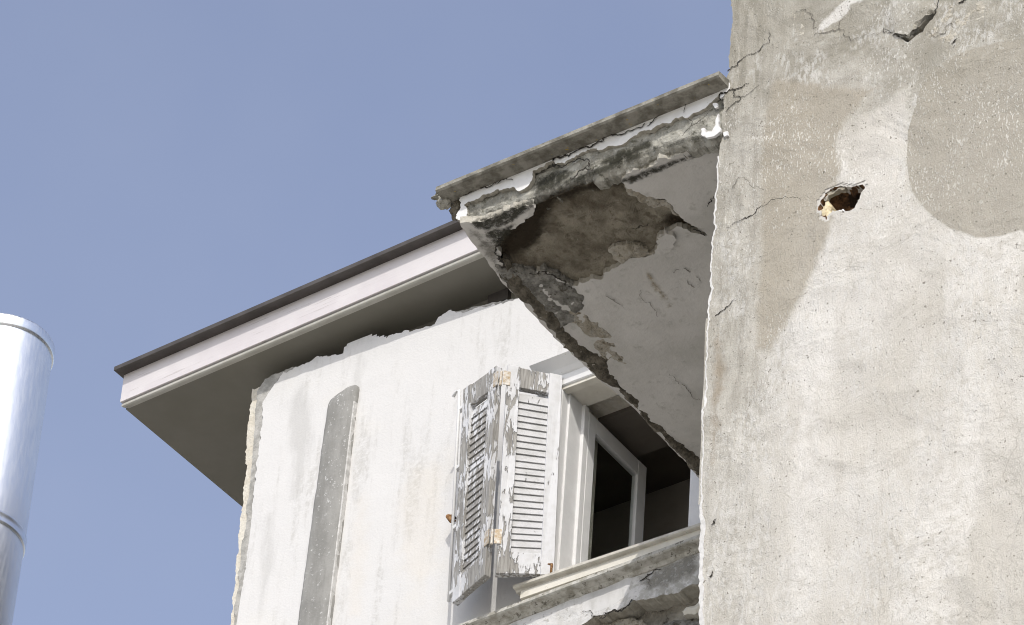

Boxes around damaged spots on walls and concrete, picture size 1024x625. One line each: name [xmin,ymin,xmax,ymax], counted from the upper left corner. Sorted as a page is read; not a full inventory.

crack [796,0,964,44]
peeling [456,83,730,222]
crack [693,177,801,236]
leakage [698,33,1024,508]
spalling [495,156,720,625]